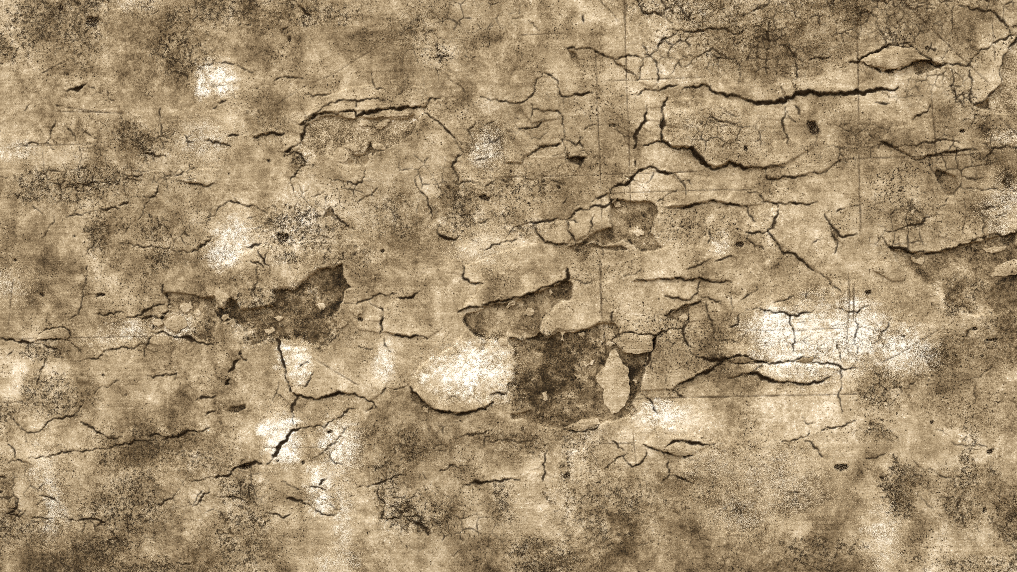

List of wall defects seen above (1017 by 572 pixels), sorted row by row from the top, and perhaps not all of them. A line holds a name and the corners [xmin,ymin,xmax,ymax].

crack [208,73,506,190]
crack [4,243,214,382]
crack [0,359,247,539]
flaking render [153,264,363,345]
crack [274,454,342,519]
crack [195,338,546,504]
flaking render [411,392,429,413]
crack [427,198,455,241]
flaking render [463,280,656,428]
crack [571,427,714,482]
crack [458,0,1017,457]
flaking render [889,233,1017,315]